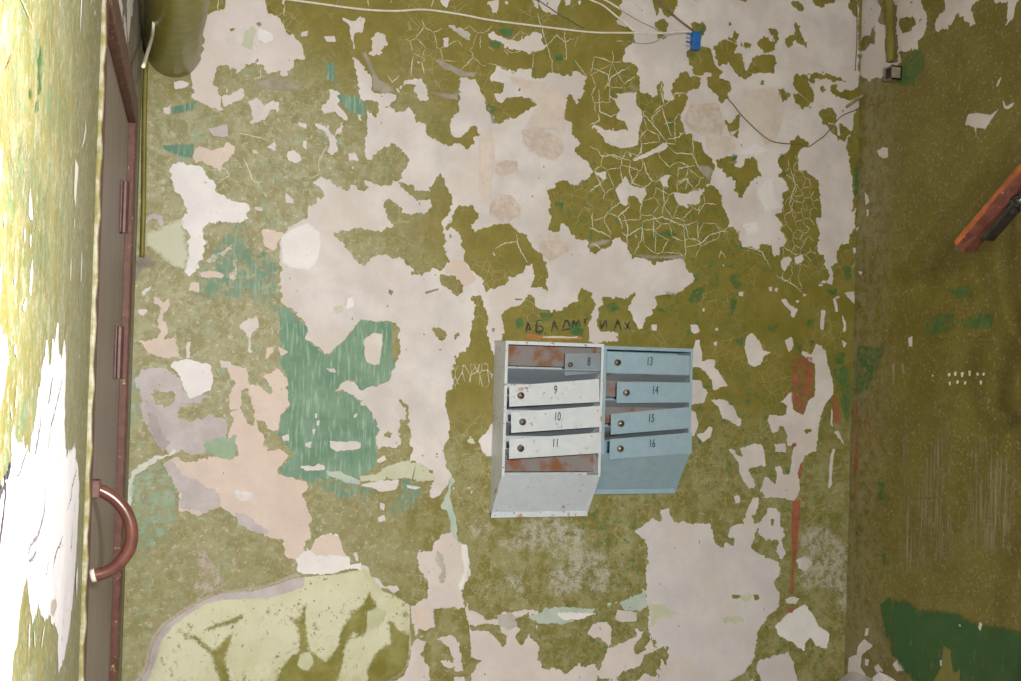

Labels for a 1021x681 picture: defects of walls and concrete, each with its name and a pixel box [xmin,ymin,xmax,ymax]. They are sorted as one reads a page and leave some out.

crack [387,0,818,292]
peeling [590,0,979,286]
peeling [965,101,1014,133]
crack [0,379,62,545]
spalling [0,115,79,681]
crack [28,479,73,575]
peeling [129,0,695,596]
peeling [396,325,848,681]
corrosion [790,500,801,595]
corrosion [790,356,814,415]
peeling [820,292,855,347]
peeling [848,628,904,675]